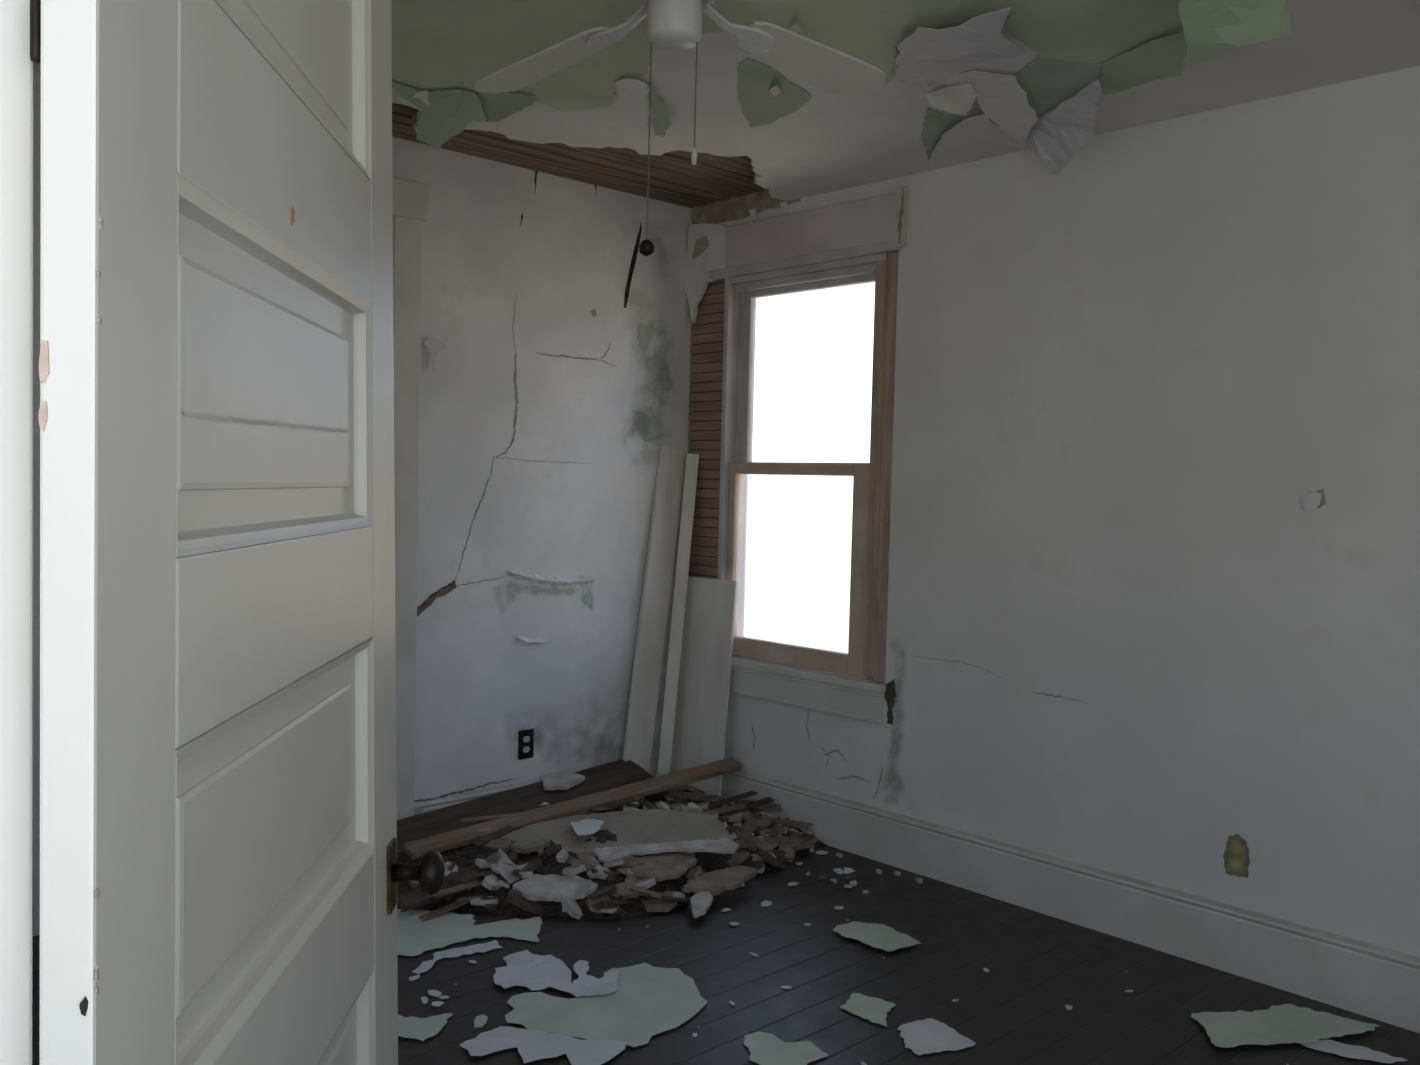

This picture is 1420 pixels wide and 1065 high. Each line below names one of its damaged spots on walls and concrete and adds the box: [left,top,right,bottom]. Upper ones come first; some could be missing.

peeling [391,0,671,150]
peeling [702,0,1293,175]
crack [455,302,617,586]
spalling [1223,834,1250,878]